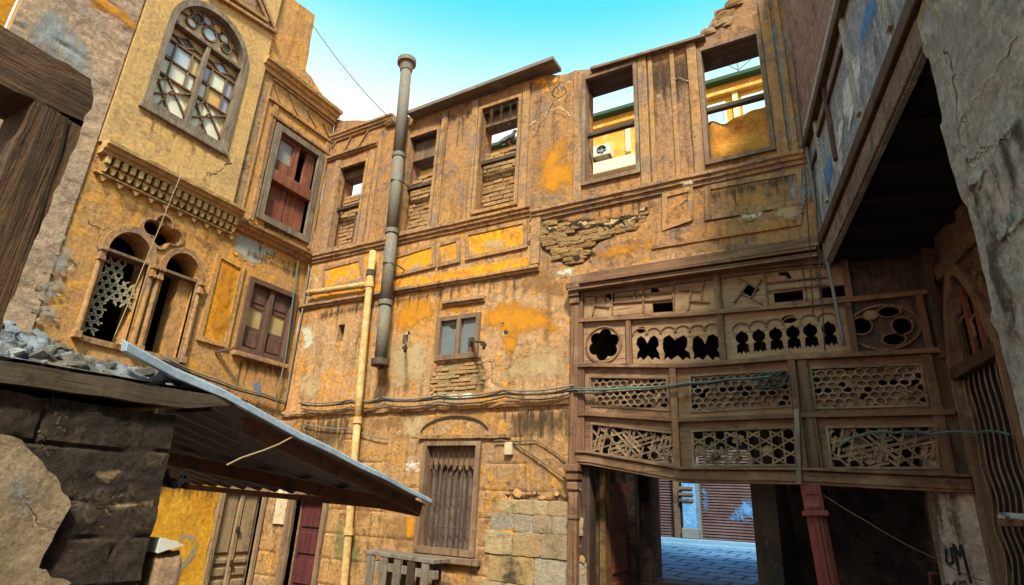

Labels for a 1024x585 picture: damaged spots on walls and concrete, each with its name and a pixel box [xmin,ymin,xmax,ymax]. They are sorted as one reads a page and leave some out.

crack [528,80,574,145]
crack [197,163,232,185]
crack [942,50,1016,243]
spalling [31,234,75,324]
flaking render [232,231,274,266]
flaking render [540,204,652,268]
flaking render [428,361,487,398]